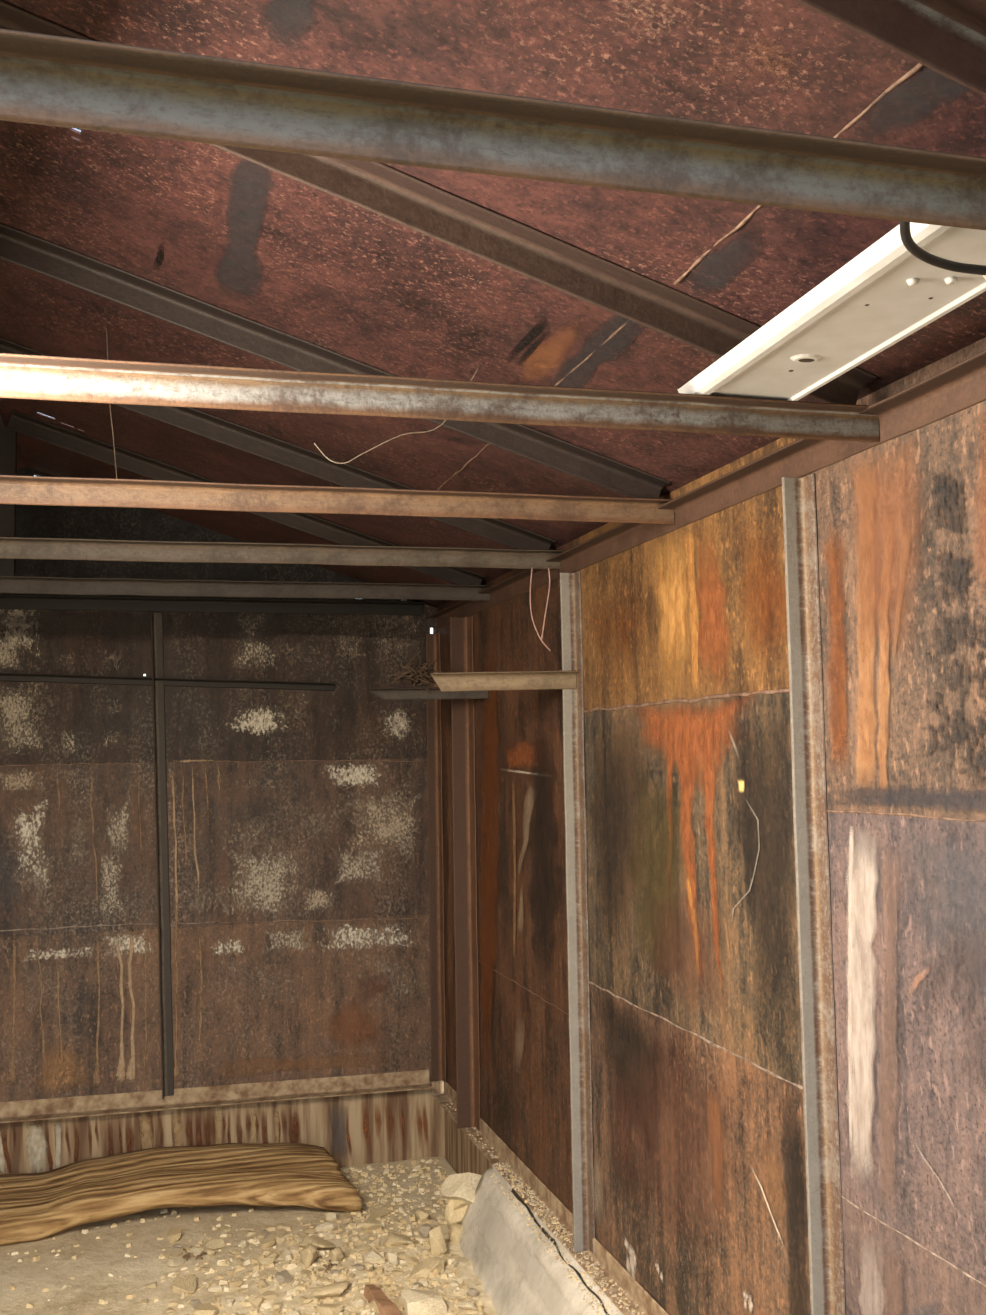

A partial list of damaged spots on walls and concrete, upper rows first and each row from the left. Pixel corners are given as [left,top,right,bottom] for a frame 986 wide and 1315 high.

water stain [218,162,270,293]
water stain [0,612,344,637]
rust [658,537,727,682]
rust [645,704,735,977]